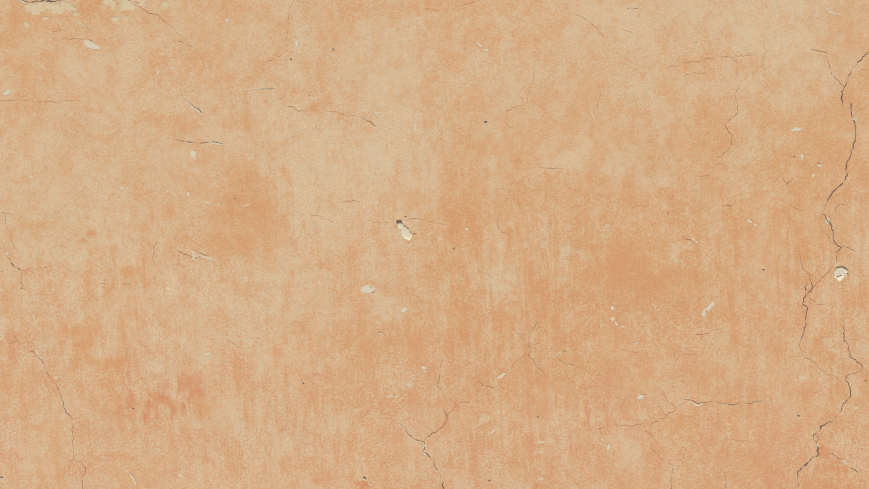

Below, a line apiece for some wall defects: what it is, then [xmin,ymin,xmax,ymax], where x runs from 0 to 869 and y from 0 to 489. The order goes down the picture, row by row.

crack [666,44,766,177]
crack [2,212,86,488]
spalling [394,216,417,247]
crack [379,359,461,489]
crack [598,315,770,489]
crack [782,50,868,489]